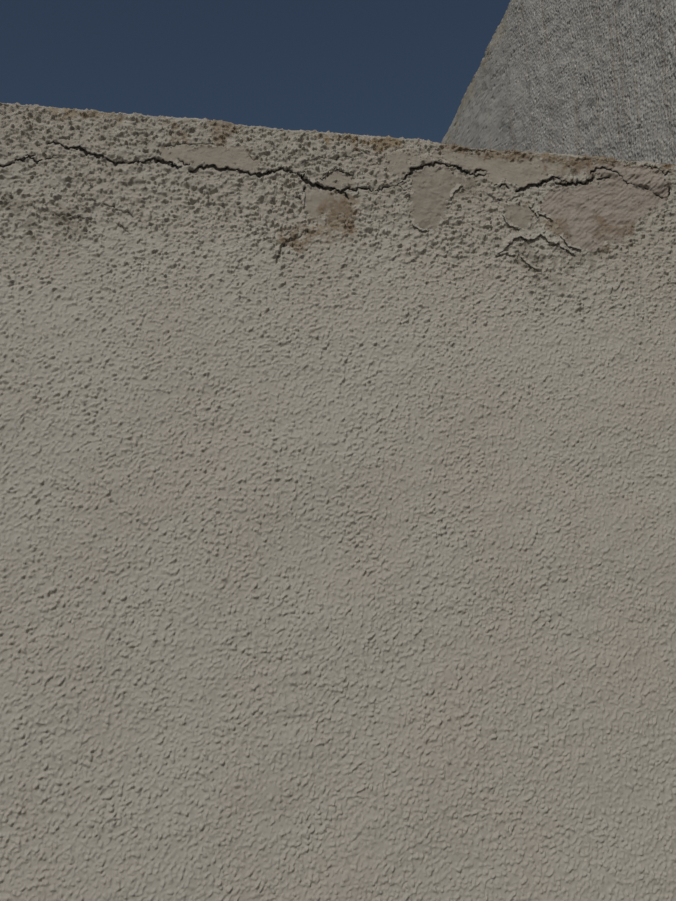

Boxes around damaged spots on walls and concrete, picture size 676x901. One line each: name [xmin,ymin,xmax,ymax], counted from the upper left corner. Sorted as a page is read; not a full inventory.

peeling [298,165,356,221]
crack [0,141,671,202]
peeling [383,146,670,270]